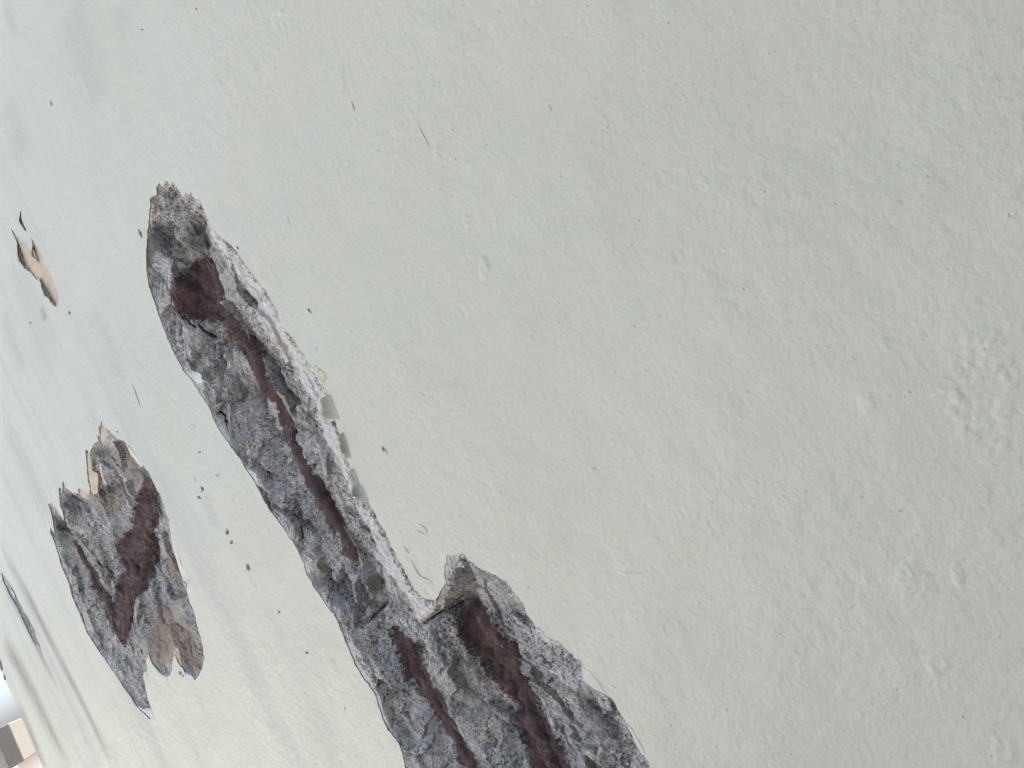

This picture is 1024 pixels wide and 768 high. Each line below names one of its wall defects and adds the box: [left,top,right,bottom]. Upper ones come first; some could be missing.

peeling [13,219,59,306]
rust [168,251,270,382]
rust [73,471,162,648]
spalling [48,424,204,719]
spalling [138,181,650,768]
rust [389,626,479,768]
rust [450,594,571,768]